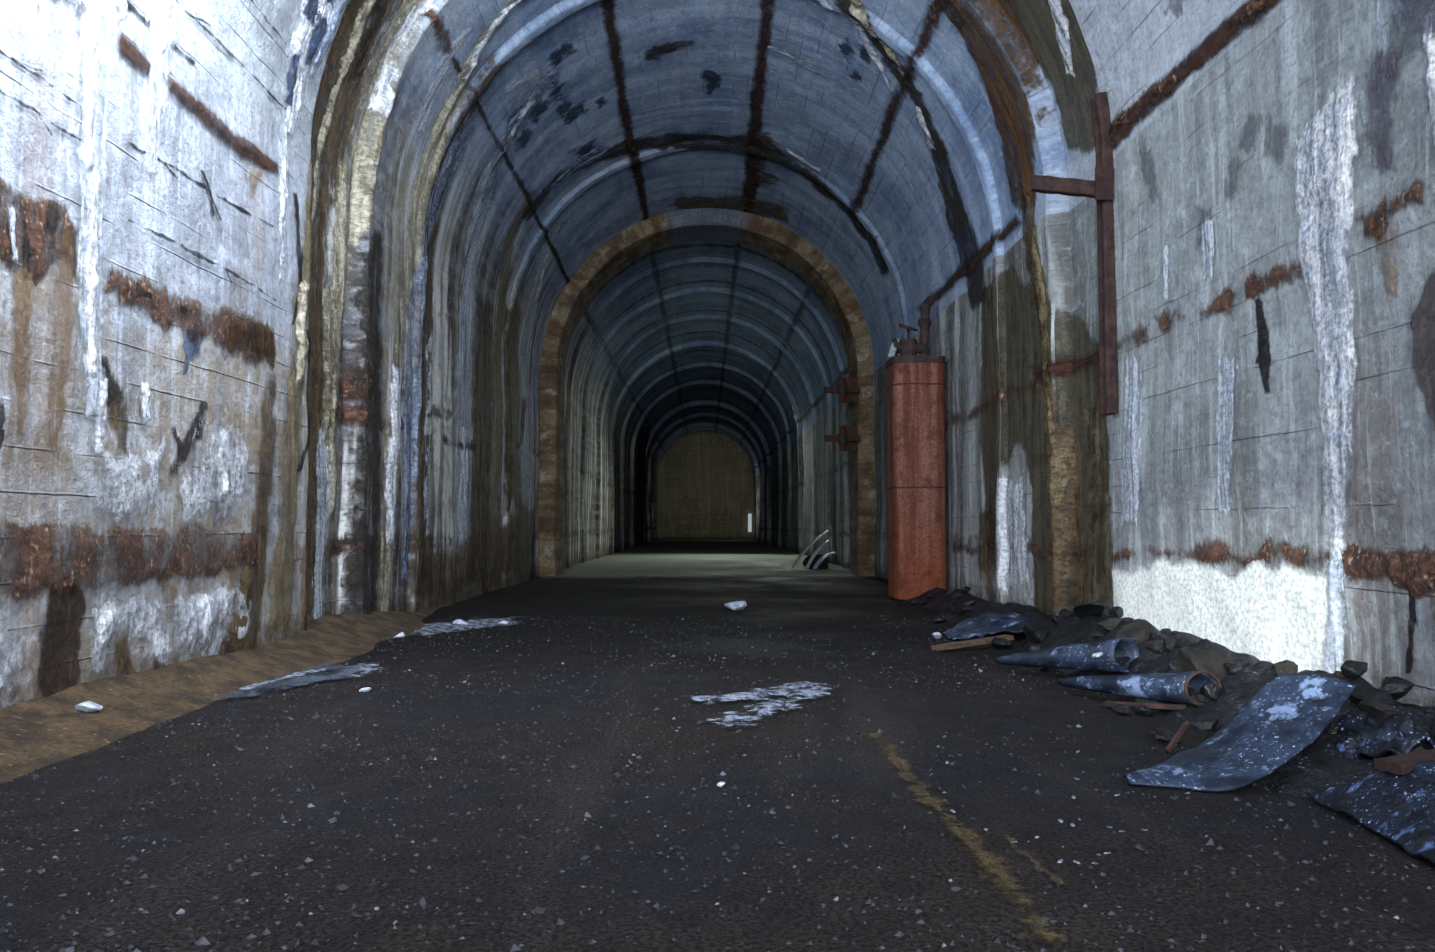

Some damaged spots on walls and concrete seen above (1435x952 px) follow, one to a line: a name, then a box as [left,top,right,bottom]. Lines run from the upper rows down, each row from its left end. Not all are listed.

rust [0,177,78,451]
efflorescence [77,0,128,417]
rust [104,269,276,367]
water stain [221,0,889,655]
water stain [818,0,1143,615]
water stain [1197,210,1214,280]
rust [1116,262,1302,349]
water stain [1224,0,1435,673]
rust [1329,179,1424,293]
water stain [1216,357,1235,514]
rust [0,520,259,623]
rust [1149,538,1435,599]